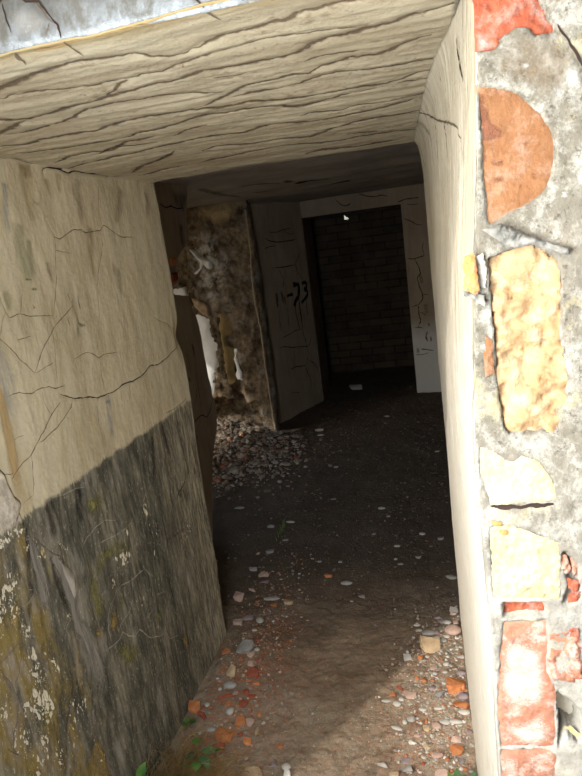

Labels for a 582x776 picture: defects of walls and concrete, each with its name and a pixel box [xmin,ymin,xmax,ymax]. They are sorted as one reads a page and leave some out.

crack [23,0,83,56]
spalling [472,0,553,52]
crack [557,24,582,66]
crack [419,112,463,156]
spalling [475,85,554,223]
crack [0,167,177,636]
spalling [488,245,568,432]
spalling [480,447,556,505]
crack [0,630,58,776]
water stain [25,531,105,686]
crack [106,569,174,651]
spalling [490,521,582,776]